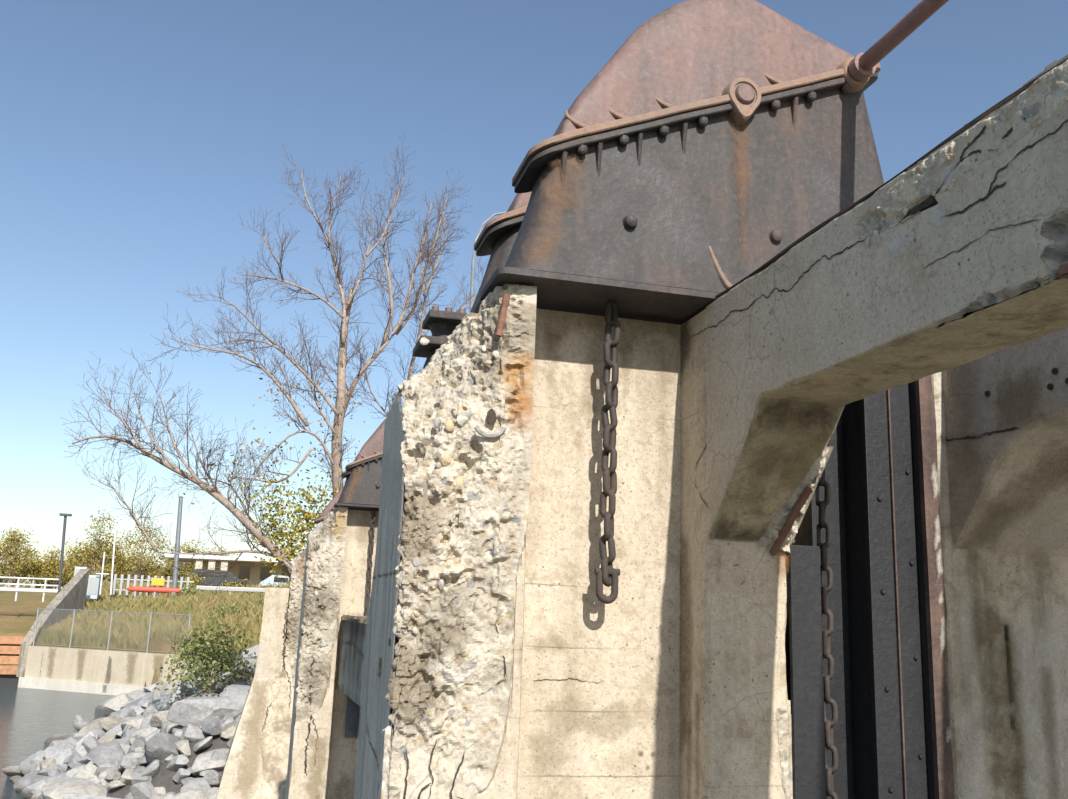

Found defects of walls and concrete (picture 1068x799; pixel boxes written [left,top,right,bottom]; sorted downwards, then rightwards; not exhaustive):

peeling [854,54,1068,247]
crack [933,93,1068,221]
crack [691,234,873,337]
crack [924,219,1041,268]
spalling [935,213,1068,329]
spalling [377,284,537,799]
spalling [755,446,833,559]
crack [262,603,318,776]
spalling [258,506,368,799]
crack [403,741,466,799]